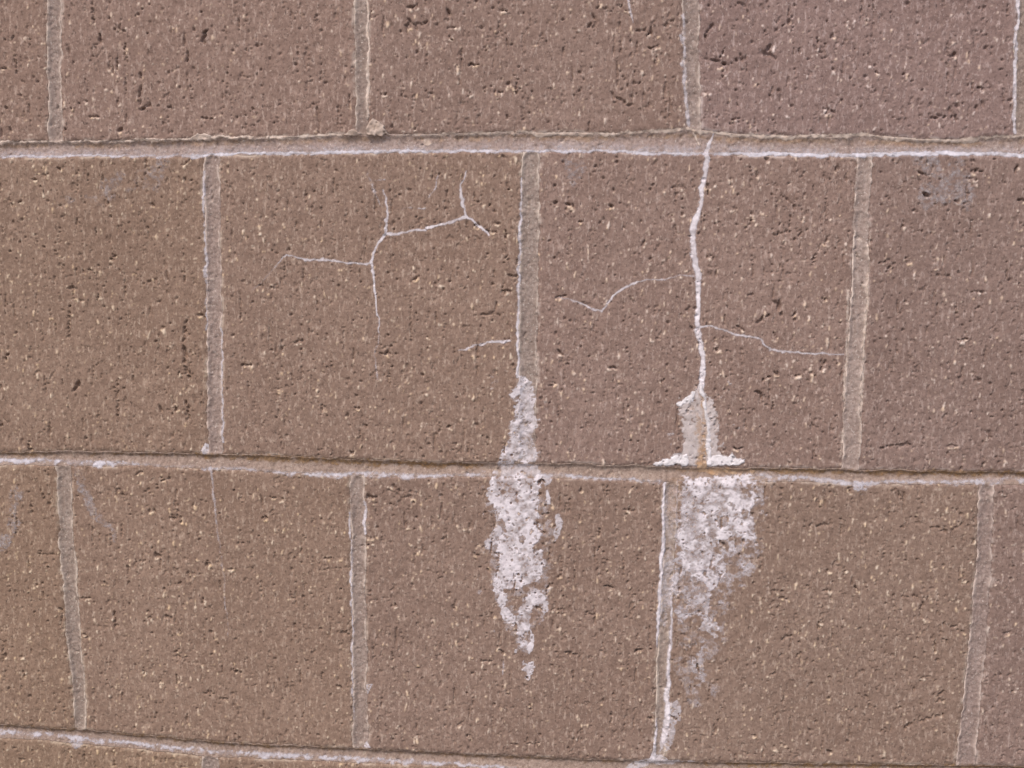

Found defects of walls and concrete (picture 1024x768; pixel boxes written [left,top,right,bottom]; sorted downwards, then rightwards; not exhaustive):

crack [284,172,489,332]
damp [232,178,563,680]
crack [465,340,510,350]
crack [576,279,663,312]
crack [689,133,842,390]
damp [859,276,869,443]
damp [628,383,1024,768]